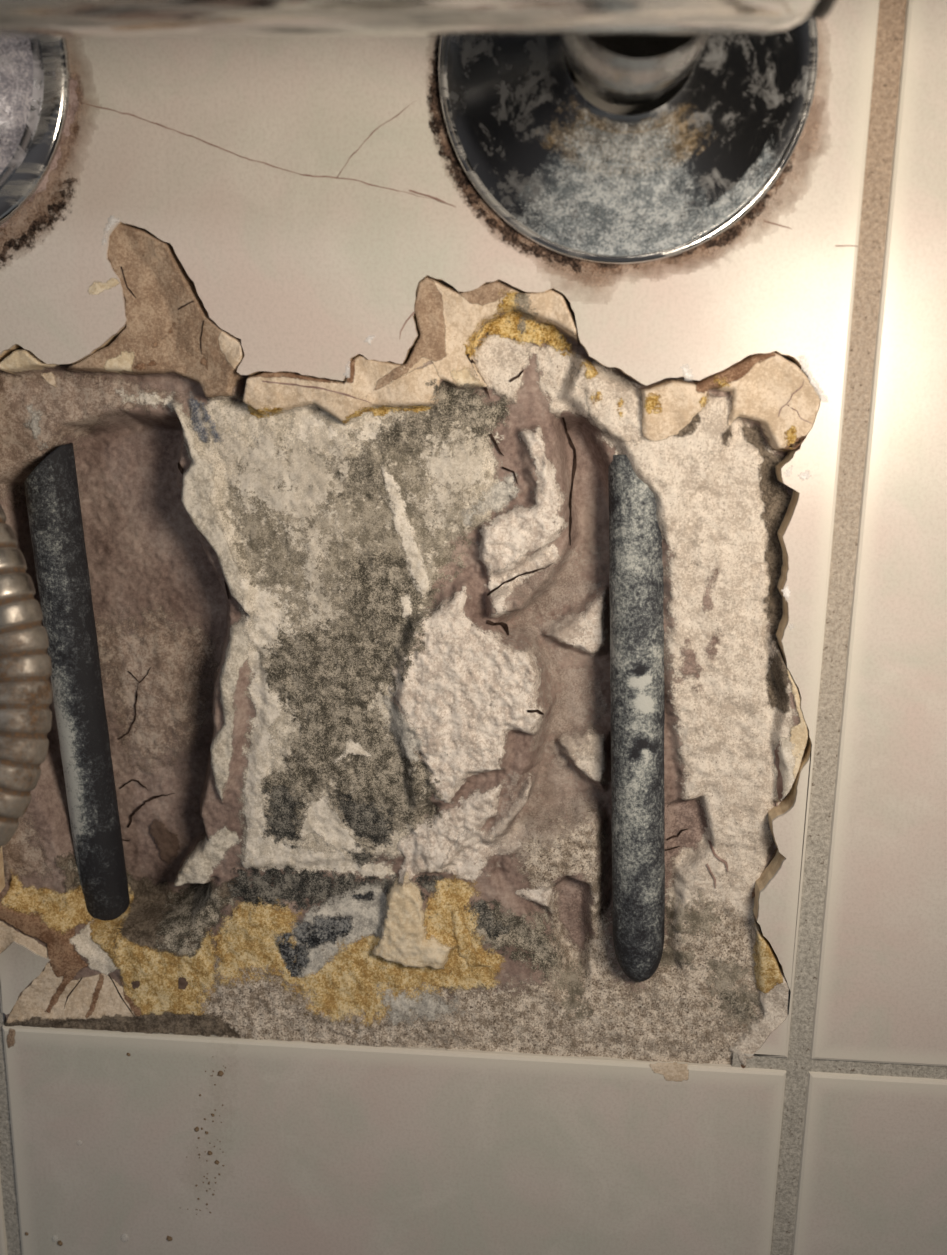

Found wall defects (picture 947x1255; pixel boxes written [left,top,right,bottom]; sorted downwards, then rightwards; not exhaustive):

crack [84,100,455,207]
leakage [189,381,504,913]
spalling [0,216,828,1082]